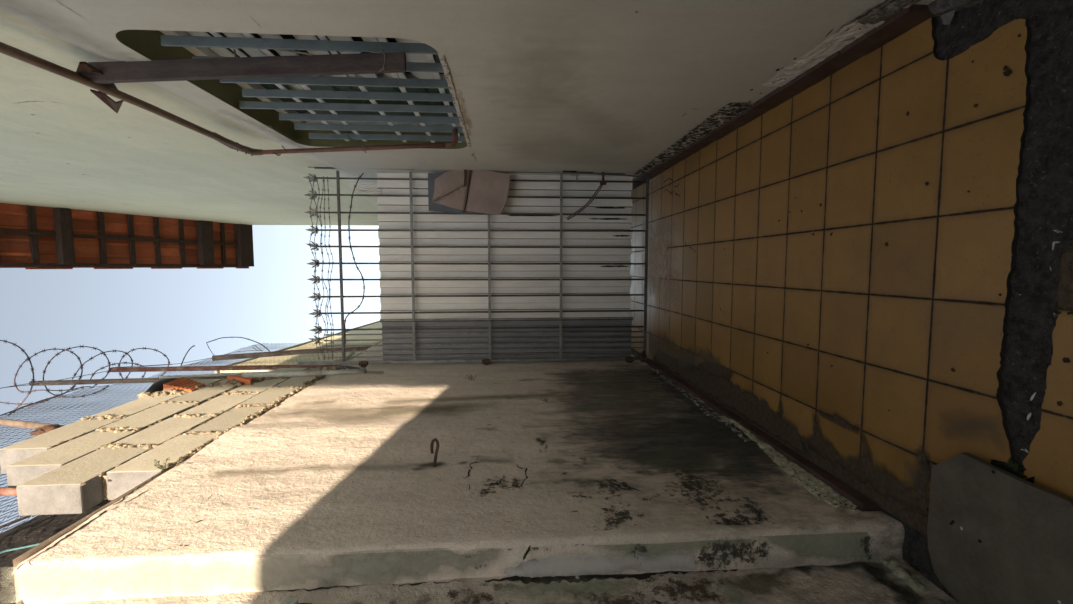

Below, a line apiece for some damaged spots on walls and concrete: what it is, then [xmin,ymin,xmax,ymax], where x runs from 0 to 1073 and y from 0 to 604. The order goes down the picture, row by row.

peeling [635,0,921,175]
damp [575,371,775,480]
crack [270,580,457,592]